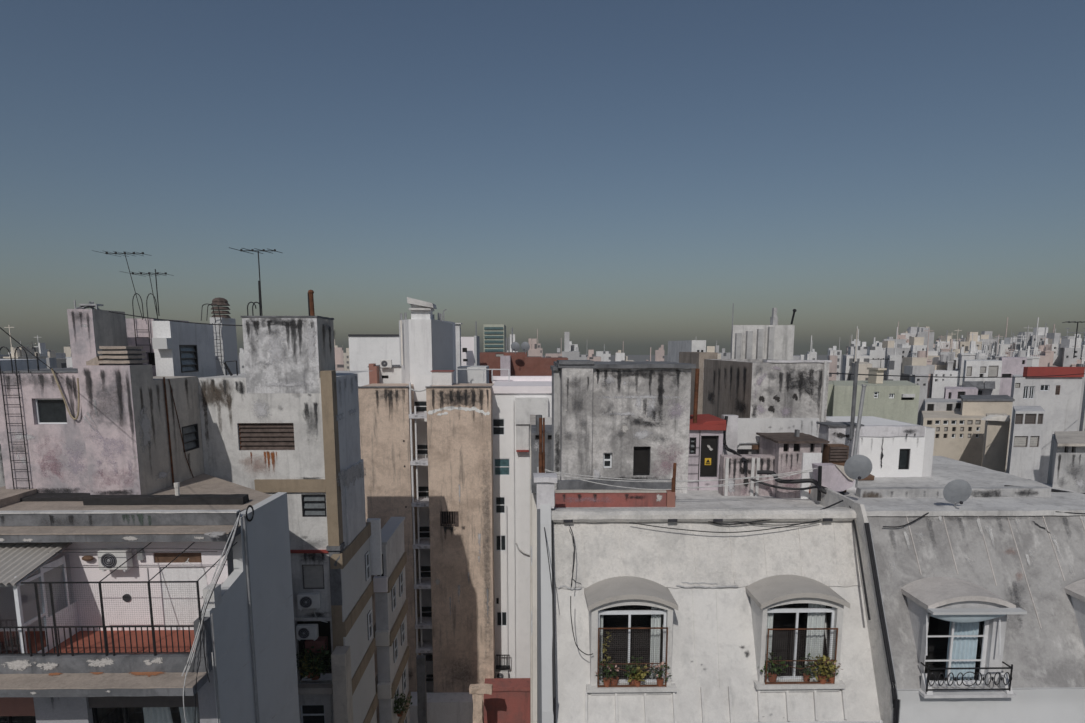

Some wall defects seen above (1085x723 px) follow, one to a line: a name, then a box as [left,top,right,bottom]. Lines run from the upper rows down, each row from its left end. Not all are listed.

damp [285,319,335,353]
damp [38,370,188,450]
damp [201,380,243,437]
damp [432,389,489,410]
damp [587,369,677,426]
damp [714,367,746,394]
damp [779,370,823,406]
rust [250,451,277,468]